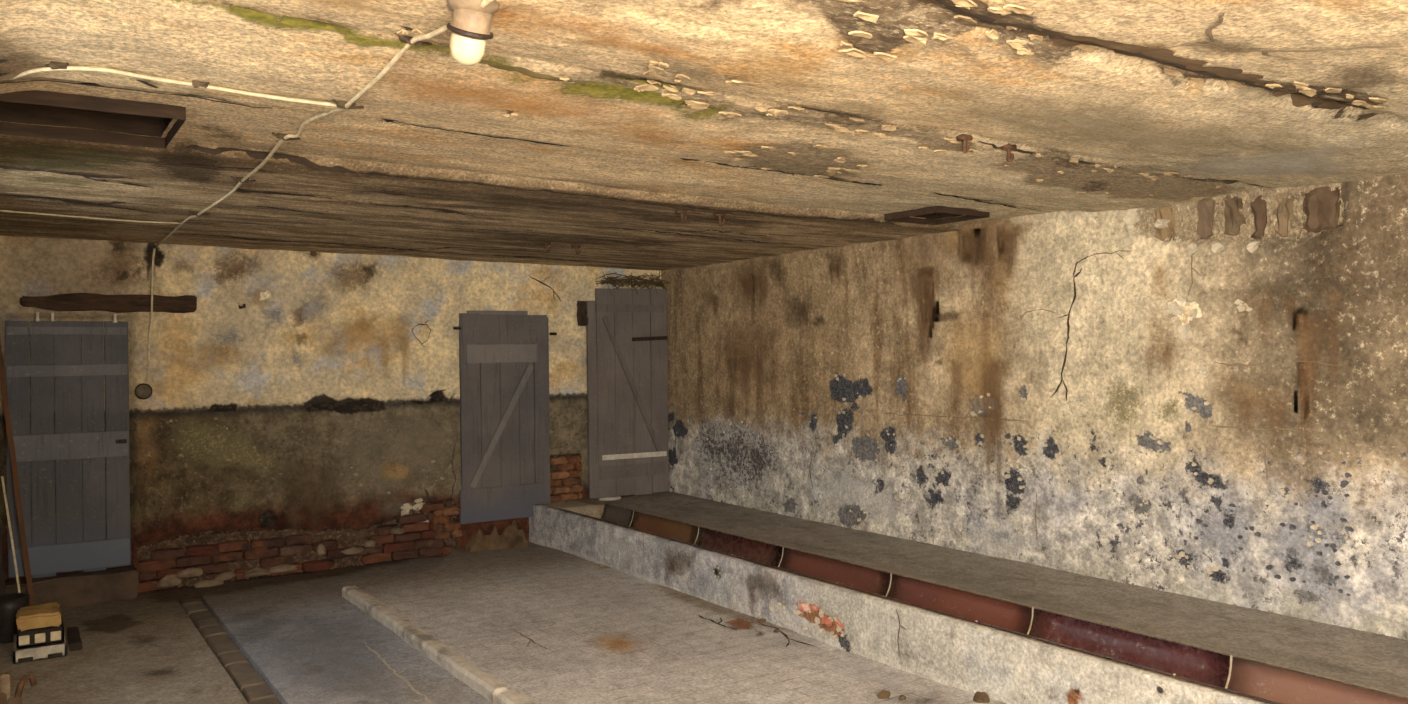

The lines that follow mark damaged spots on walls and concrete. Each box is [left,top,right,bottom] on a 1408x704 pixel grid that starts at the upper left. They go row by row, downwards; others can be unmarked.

spalling [786,0,1066,67]
spalling [1266,82,1389,121]
flaking render [1122,171,1344,256]
crack [1016,250,1131,401]
flaking render [133,498,462,593]
peeling [809,372,898,494]
peeling [915,465,952,510]
crack [884,412,1022,429]
peeling [1004,433,1060,525]
peeling [1174,456,1261,584]
peeling [1266,461,1353,605]
flaking render [758,600,851,652]